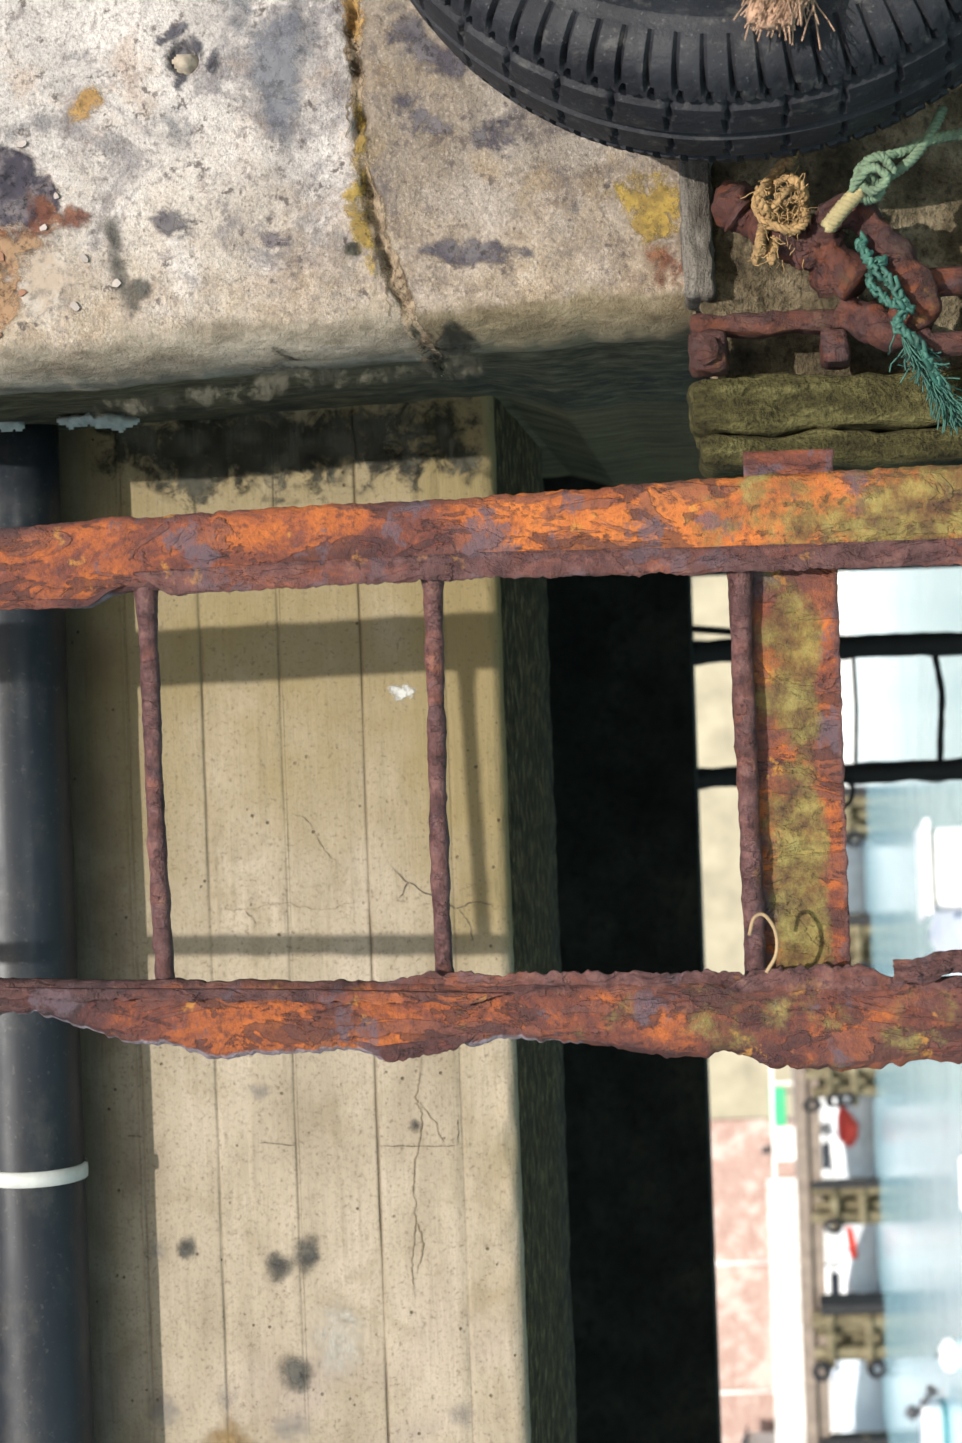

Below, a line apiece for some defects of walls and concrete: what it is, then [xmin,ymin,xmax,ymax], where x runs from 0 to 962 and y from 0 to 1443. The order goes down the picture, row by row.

crack [343,0,449,381]
corrosion [0,196,90,237]
leakage [95,321,482,504]
crack [389,1062,459,1298]
leakage [178,1241,194,1258]
leakage [268,1242,318,1281]
leakage [282,1359,310,1393]